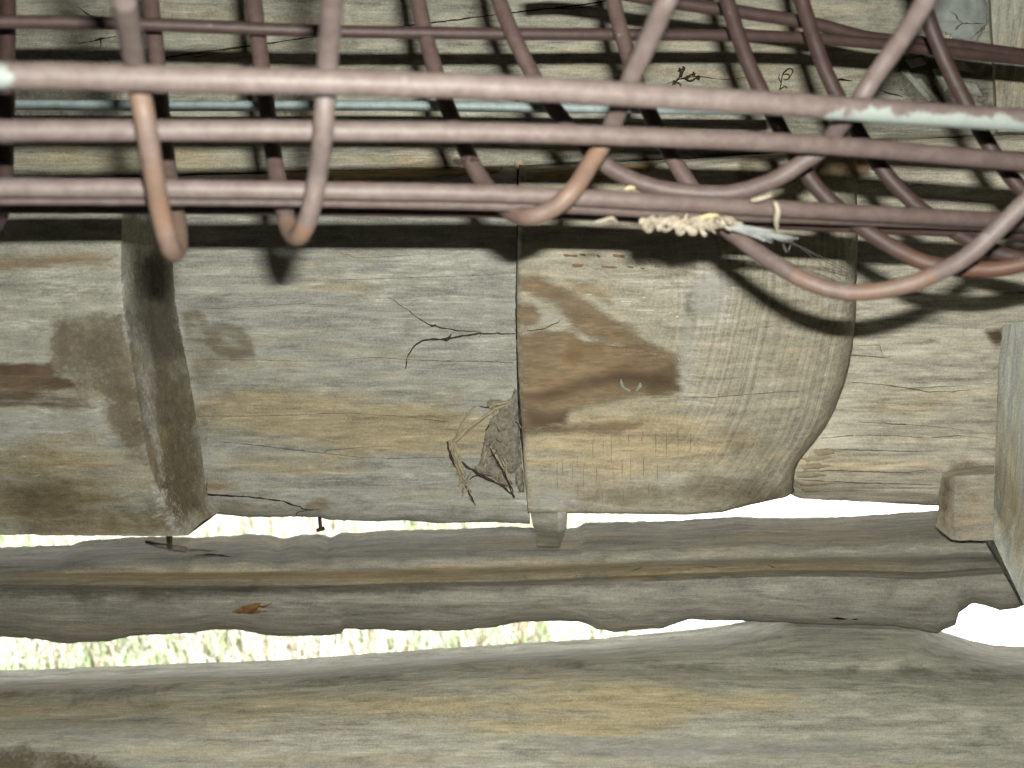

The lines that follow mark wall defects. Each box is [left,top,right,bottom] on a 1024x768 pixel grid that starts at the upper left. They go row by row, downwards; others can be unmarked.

water stain [0,283,162,478]
crack [354,356,513,364]
water stain [517,276,692,434]
crack [206,483,319,517]